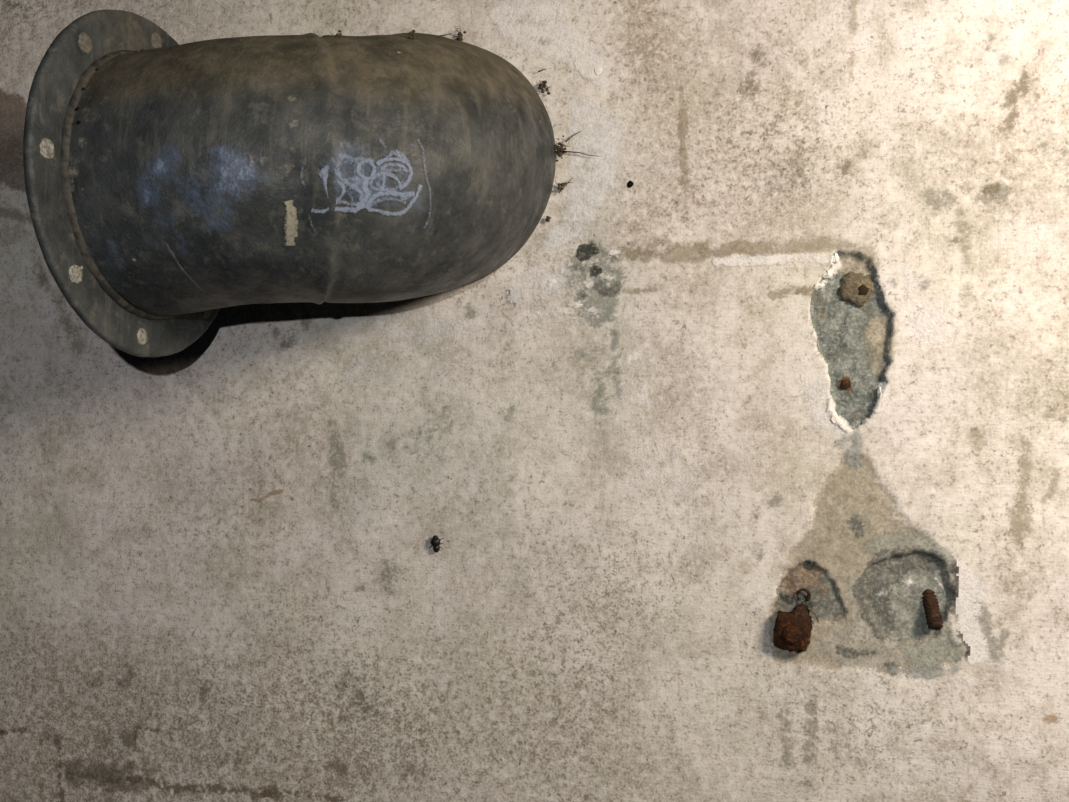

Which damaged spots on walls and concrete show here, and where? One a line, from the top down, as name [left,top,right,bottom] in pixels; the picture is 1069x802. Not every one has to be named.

water stain [0,89,26,190]
flaking render [810,246,895,468]
flaking render [775,560,847,624]
flaking render [853,548,954,641]